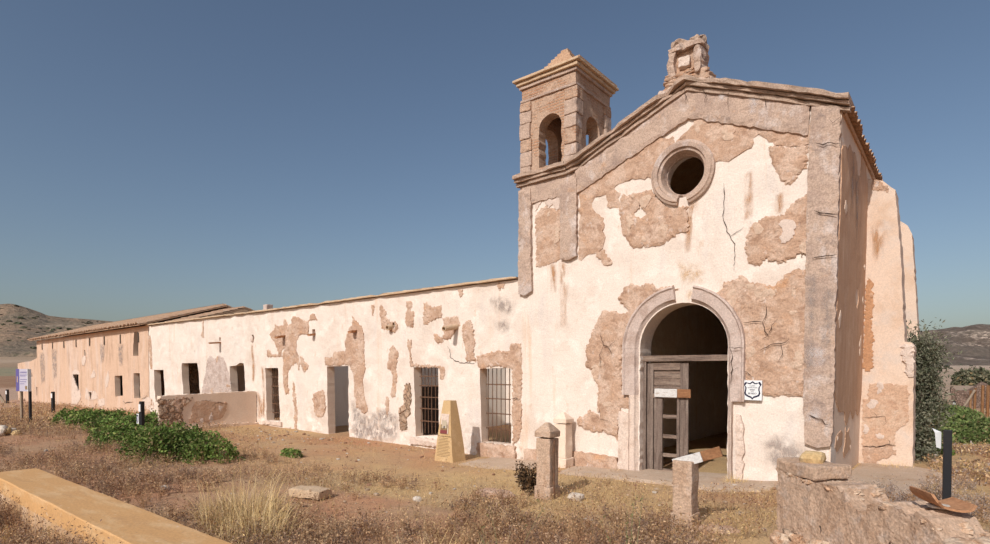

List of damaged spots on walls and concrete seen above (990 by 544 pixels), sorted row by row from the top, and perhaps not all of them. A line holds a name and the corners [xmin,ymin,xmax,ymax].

flaking render [142,355,232,427]
flaking render [267,313,317,429]
flaking render [324,316,368,414]
flaking render [371,301,523,445]
flaking render [535,197,560,267]
flaking render [577,283,679,441]
flaking render [578,119,810,266]
crack [722,191,740,261]
flaking render [717,194,807,397]
flaking render [834,145,916,463]